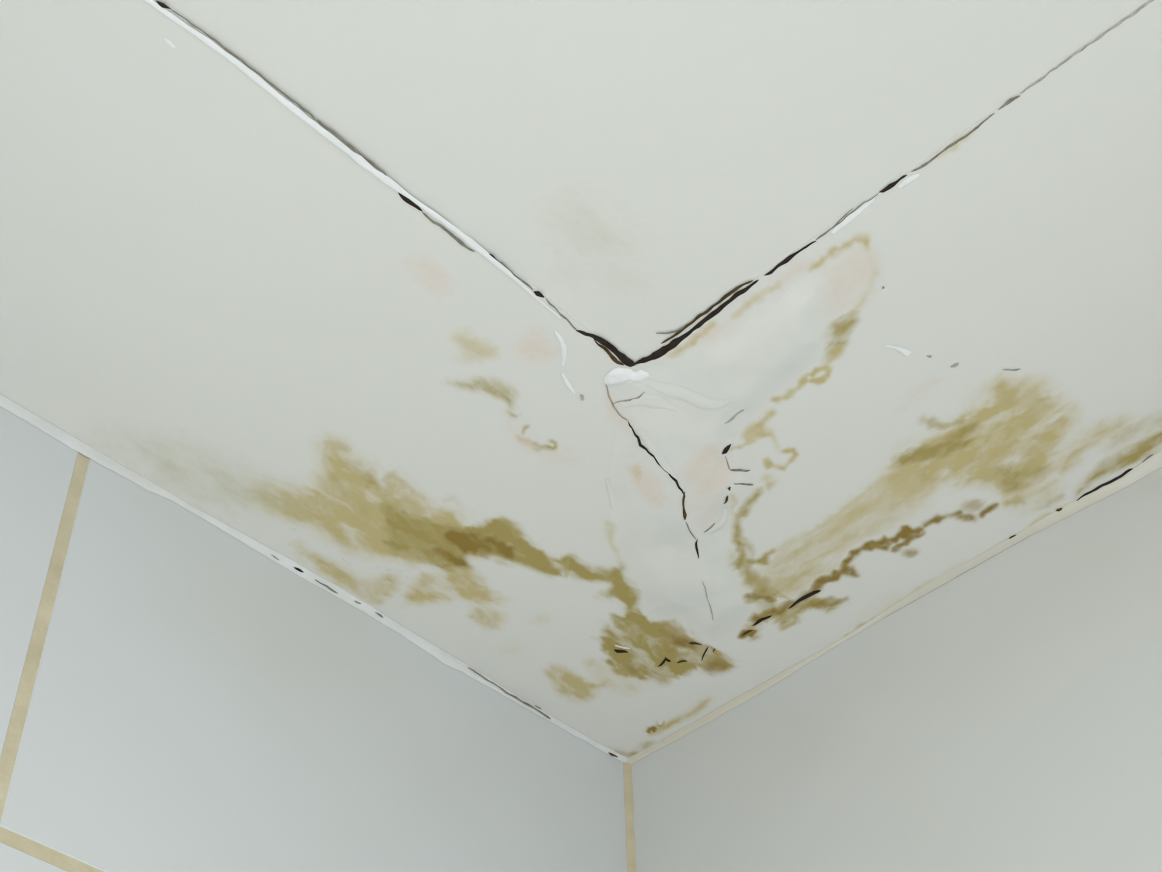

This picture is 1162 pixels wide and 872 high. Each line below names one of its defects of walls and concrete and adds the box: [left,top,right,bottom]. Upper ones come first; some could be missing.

damp [69,229,1162,708]
crack [144,0,1154,667]
damp [929,124,980,162]
damp [606,693,717,758]